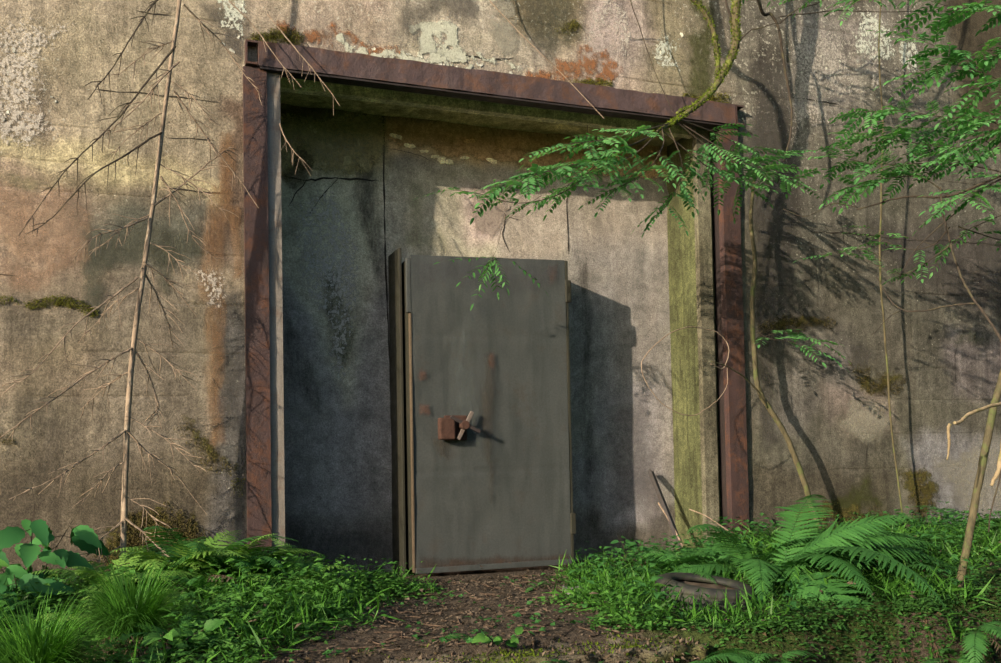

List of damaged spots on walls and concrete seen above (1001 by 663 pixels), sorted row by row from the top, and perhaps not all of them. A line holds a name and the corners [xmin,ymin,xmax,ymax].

leakage [0,16,73,146]
corrosion [525,45,618,84]
leakage [82,222,234,312]
crack [288,119,430,374]
leakage [750,12,920,442]